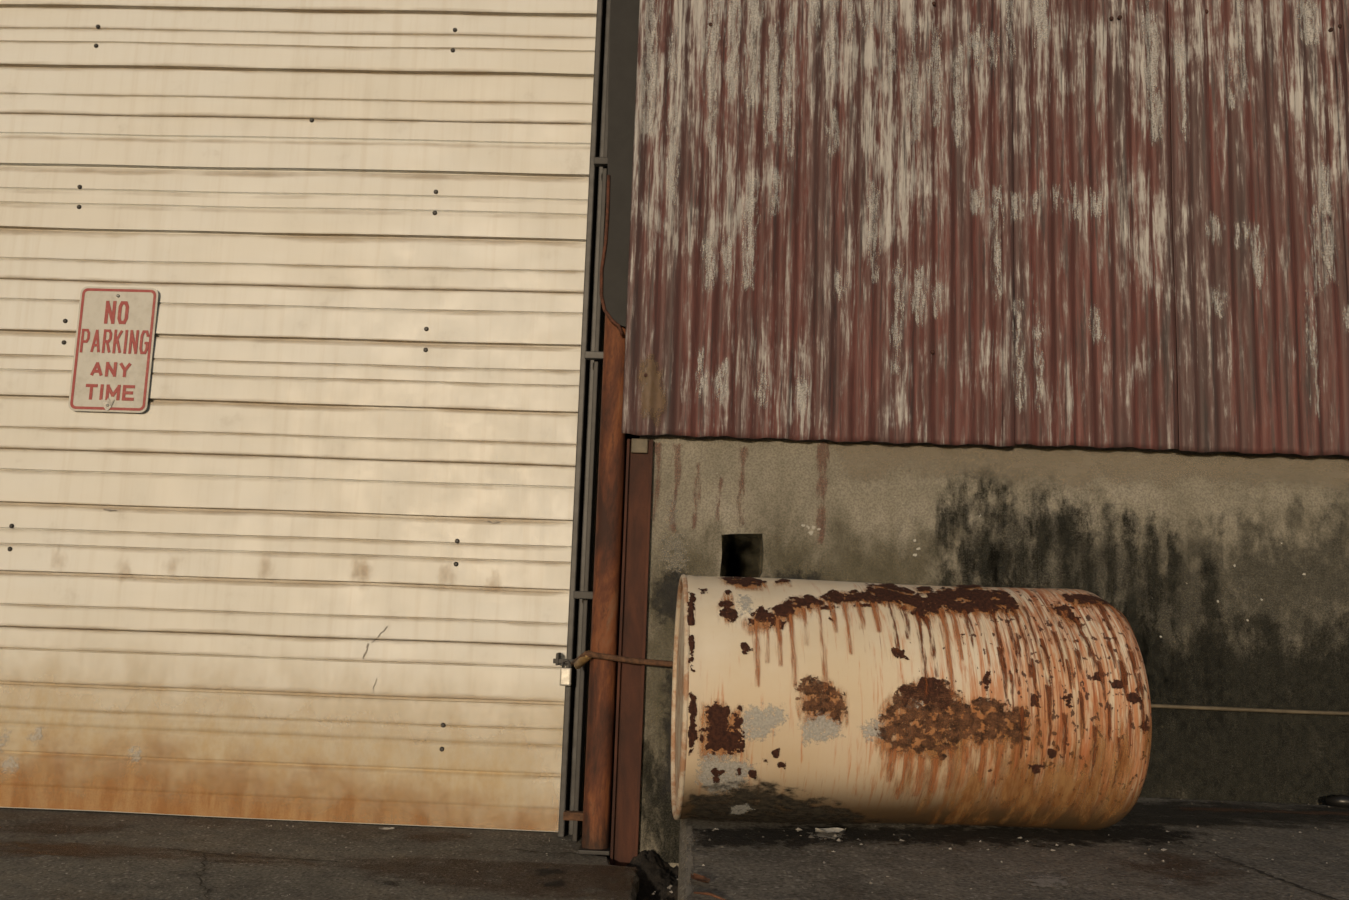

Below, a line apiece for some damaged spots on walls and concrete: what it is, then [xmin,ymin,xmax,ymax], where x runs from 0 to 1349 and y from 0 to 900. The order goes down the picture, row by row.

water stain [640,443,1349,863]
corrosion [0,683,553,831]
crack [168,848,361,900]